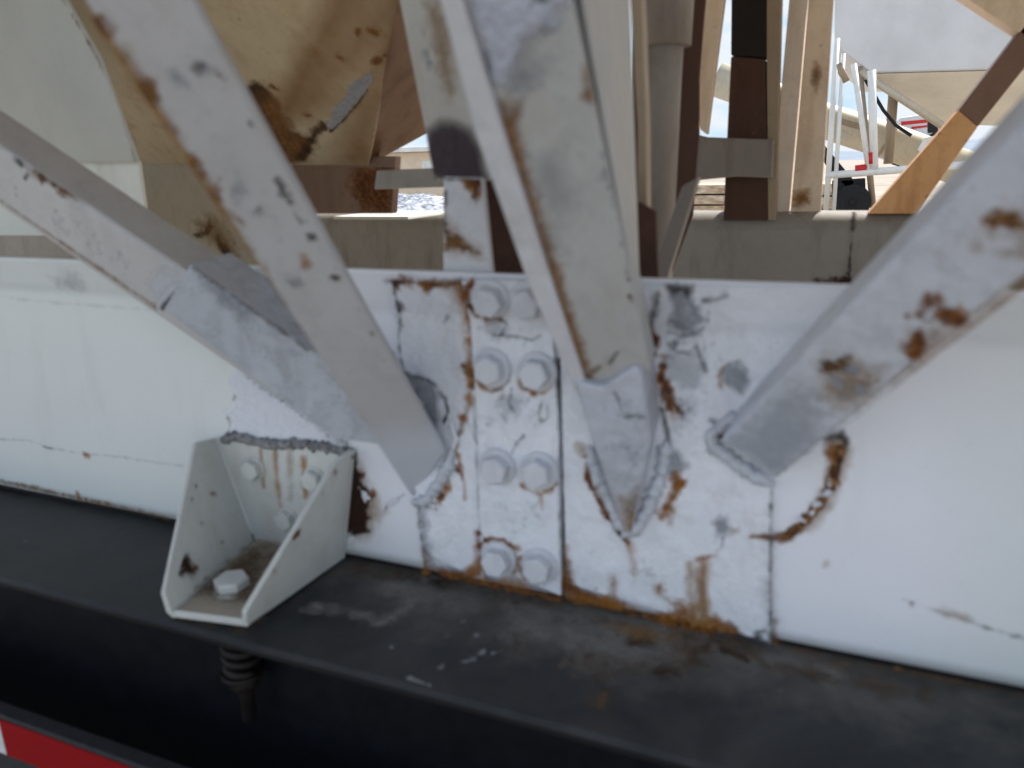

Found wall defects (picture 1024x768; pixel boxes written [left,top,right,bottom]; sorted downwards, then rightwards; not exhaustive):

corrosion [248,83,328,163]
peeling [326,54,387,132]
corrosion [351,167,394,213]
corrosion [443,178,481,255]
corrosion [390,274,502,323]
peeling [224,368,348,445]
corrosion [455,358,545,477]
corrosion [650,324,685,520]
corrosion [347,453,376,536]
corrosion [426,483,451,507]
corrosion [434,530,630,615]
corrosion [644,556,740,639]